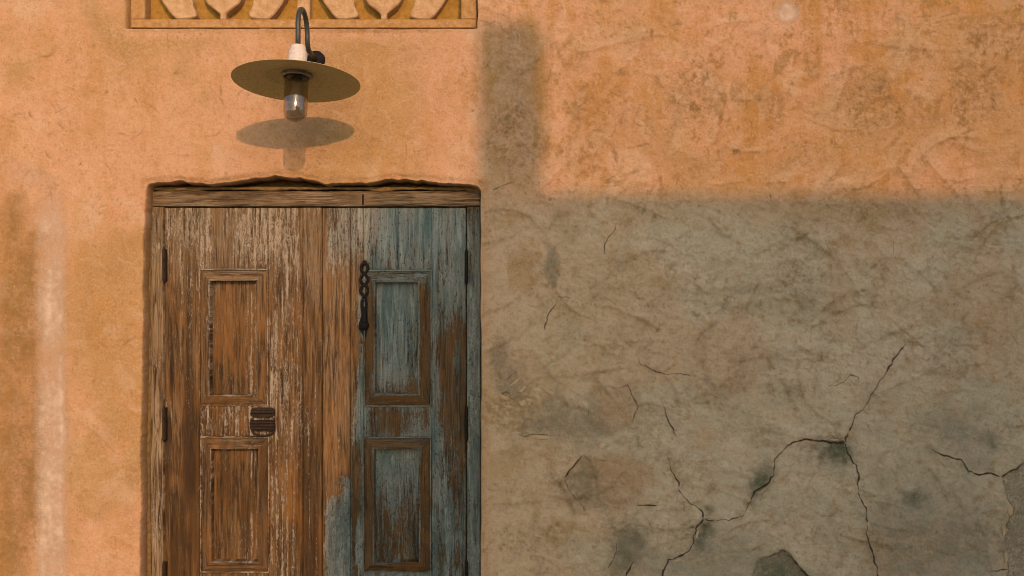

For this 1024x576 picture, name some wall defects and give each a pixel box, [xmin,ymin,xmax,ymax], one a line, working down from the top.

crack [662,345,905,576]
crack [932,449,1023,477]
flaking render [753,550,808,576]